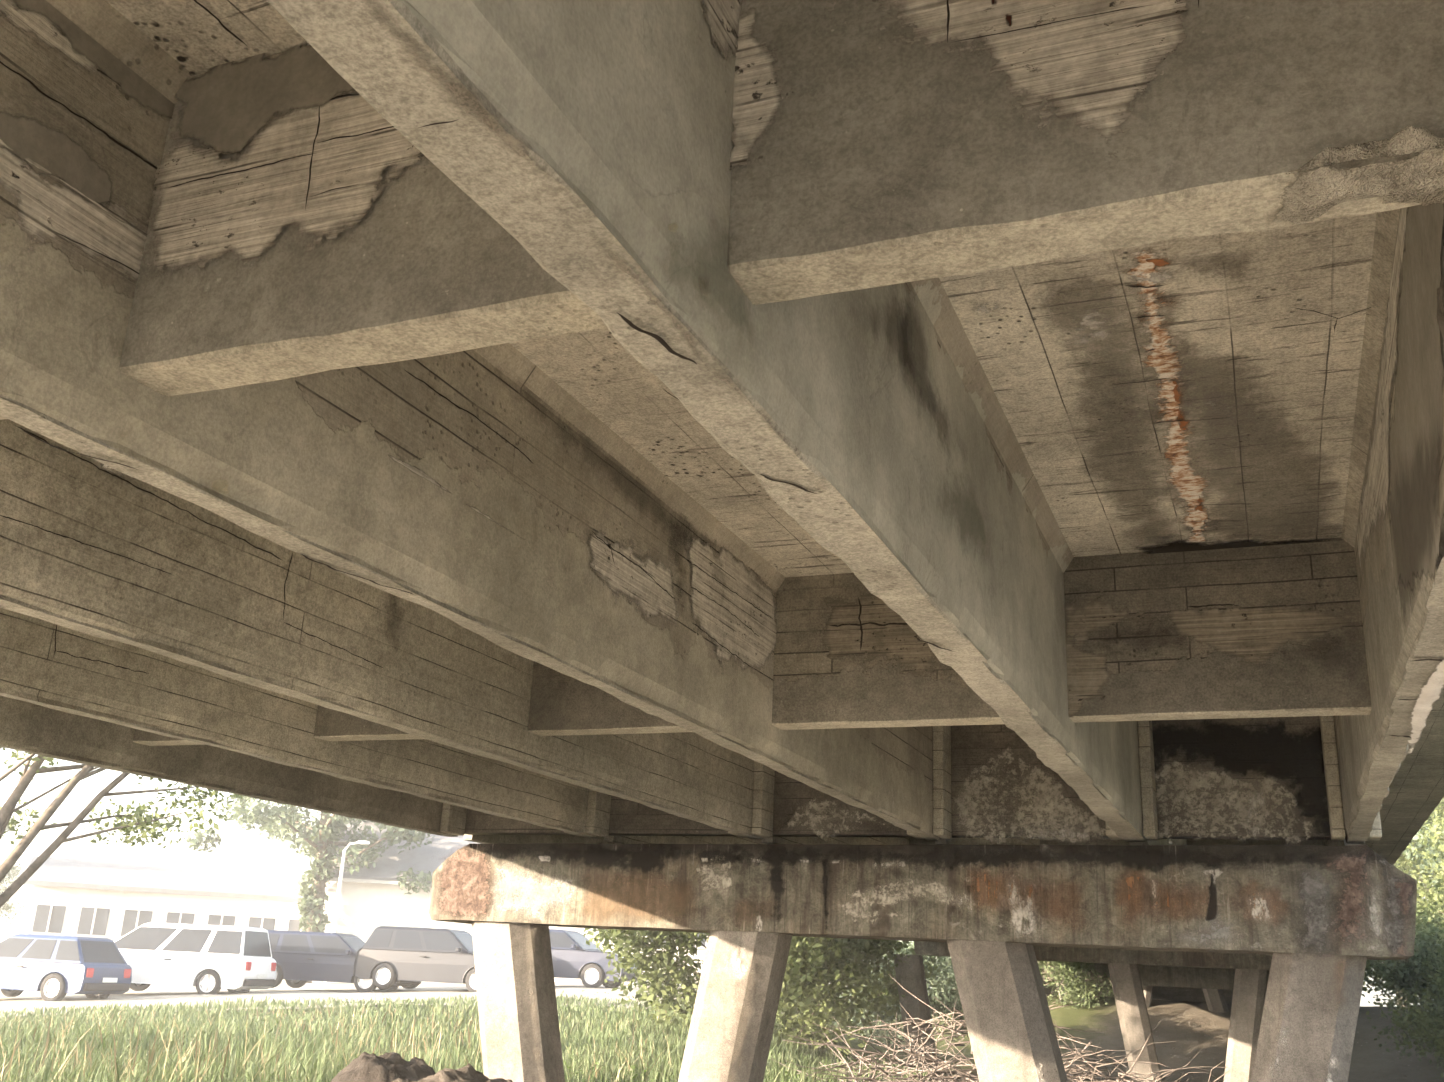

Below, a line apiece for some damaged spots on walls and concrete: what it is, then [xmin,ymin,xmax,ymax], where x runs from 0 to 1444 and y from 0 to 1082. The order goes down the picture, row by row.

crack [194,0,247,46]
peeling [698,0,794,170]
peeling [867,0,1188,162]
peeling [0,90,427,281]
corrosion [1114,250,1244,543]
spalling [1274,125,1444,578]
water stain [1137,540,1328,554]
spalling [1408,659,1444,754]
corrosion [586,875,689,918]
water stain [485,719,1331,944]
corrosion [961,872,1079,933]
corrosion [1243,882,1287,919]